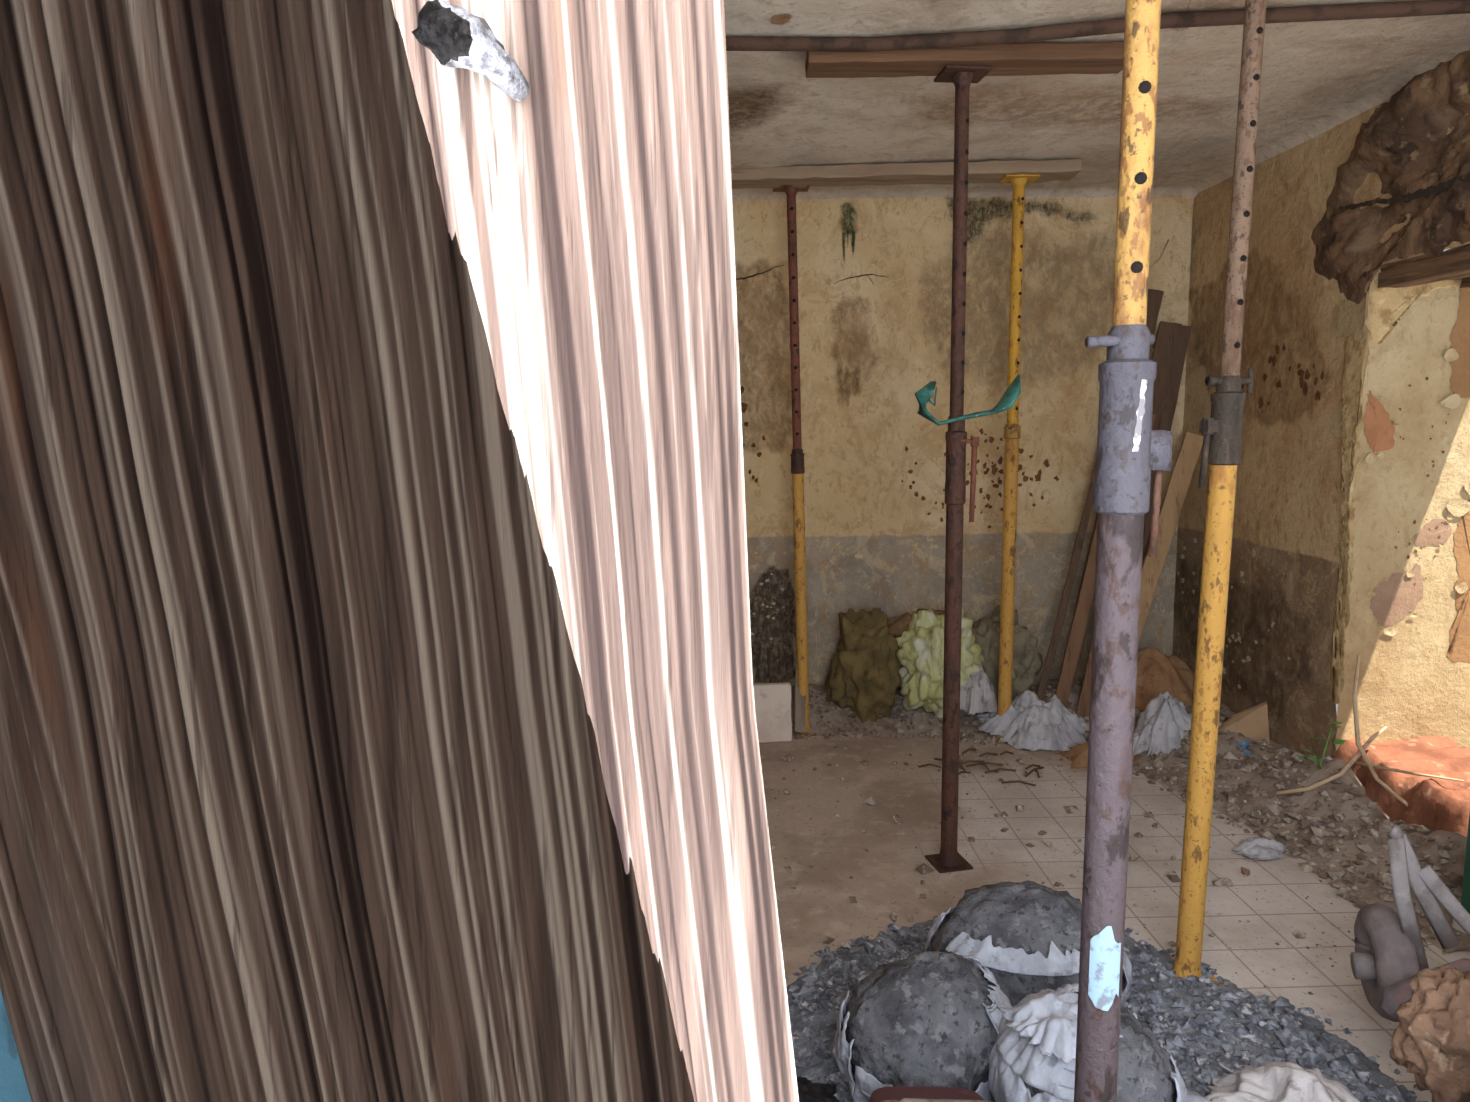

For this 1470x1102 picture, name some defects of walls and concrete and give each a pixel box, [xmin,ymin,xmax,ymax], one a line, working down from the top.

water stain [728,91,773,128]
water stain [947,197,1088,241]
water stain [1259,343,1324,409]
peeling [1311,50,1470,704]